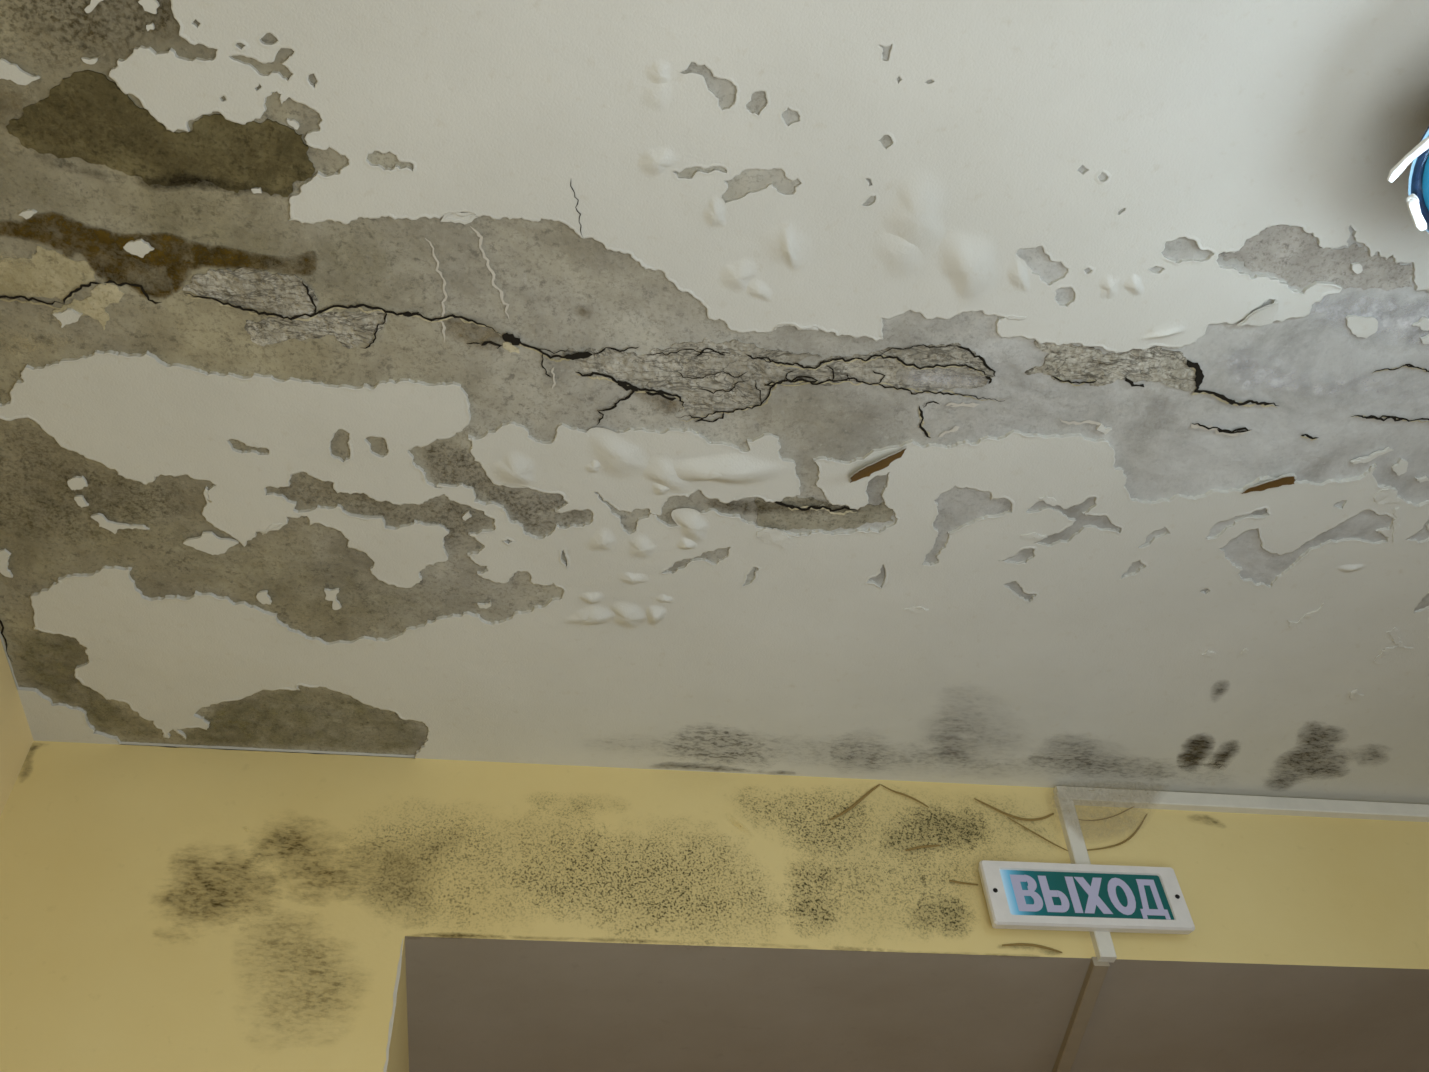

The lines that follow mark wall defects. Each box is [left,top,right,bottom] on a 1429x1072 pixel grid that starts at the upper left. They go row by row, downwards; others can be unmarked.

water stain [0,213,316,297]
crack [0,280,1005,439]
peeling [0,0,1429,759]
crack [1053,376,1144,387]
crack [1186,360,1278,436]
crack [1300,433,1318,441]
crack [1350,415,1429,423]
crack [1374,364,1429,373]
water stain [1178,736,1235,768]
water stain [412,828,772,930]
water stain [740,795,853,926]
water stain [887,813,983,849]